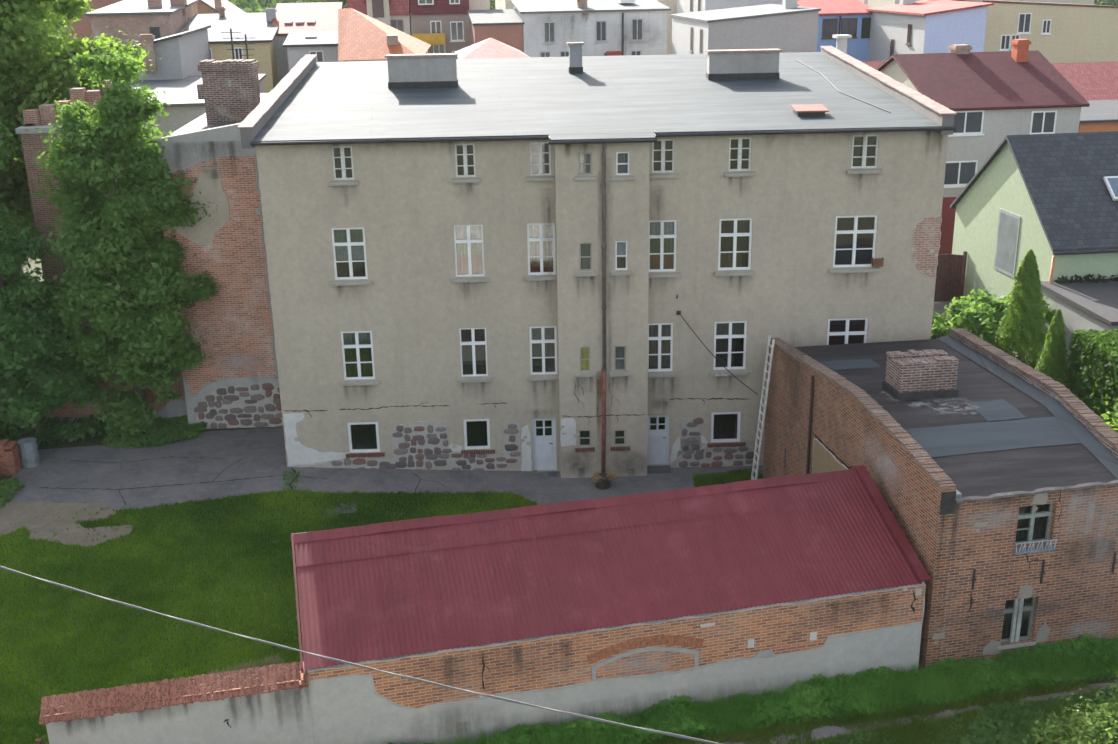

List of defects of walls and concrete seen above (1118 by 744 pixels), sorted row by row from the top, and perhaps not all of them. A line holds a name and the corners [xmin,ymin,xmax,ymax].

flaking render [911,215,942,278]
flaking render [152,154,532,471]
crack [283,402,448,417]
crack [670,397,745,405]
crack [482,654,490,691]
flaking render [308,584,925,710]